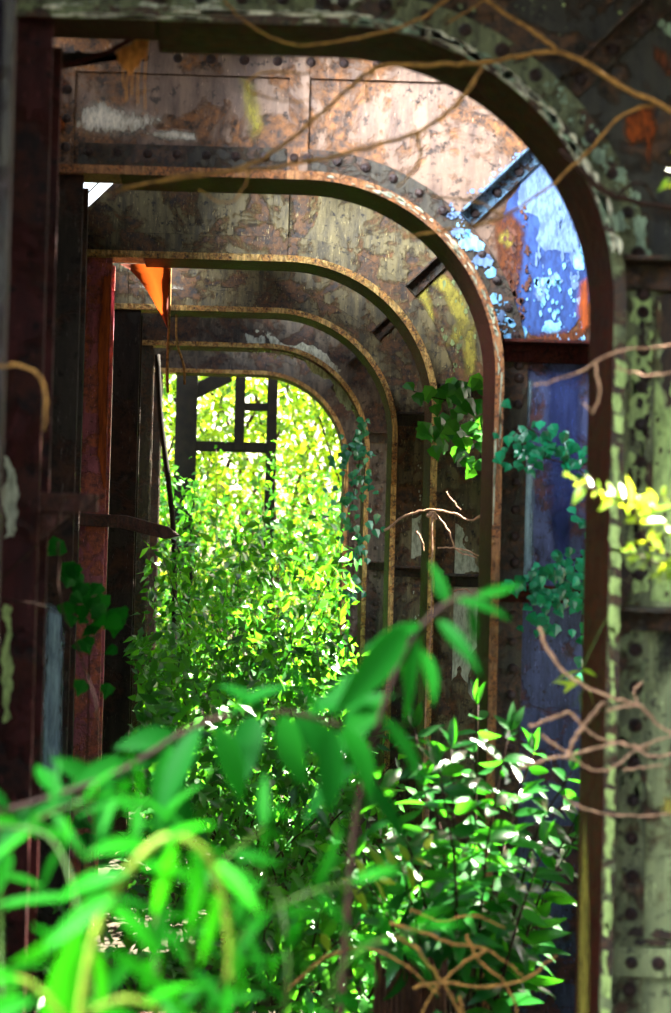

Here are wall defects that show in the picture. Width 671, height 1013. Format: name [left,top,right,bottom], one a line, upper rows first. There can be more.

peeling [42,0,652,255]
rust [624,108,656,155]
peeling [351,151,589,521]
peeling [411,490,422,559]
peeling [454,523,479,574]
peeling [452,587,478,702]
peeling [601,292,671,1013]